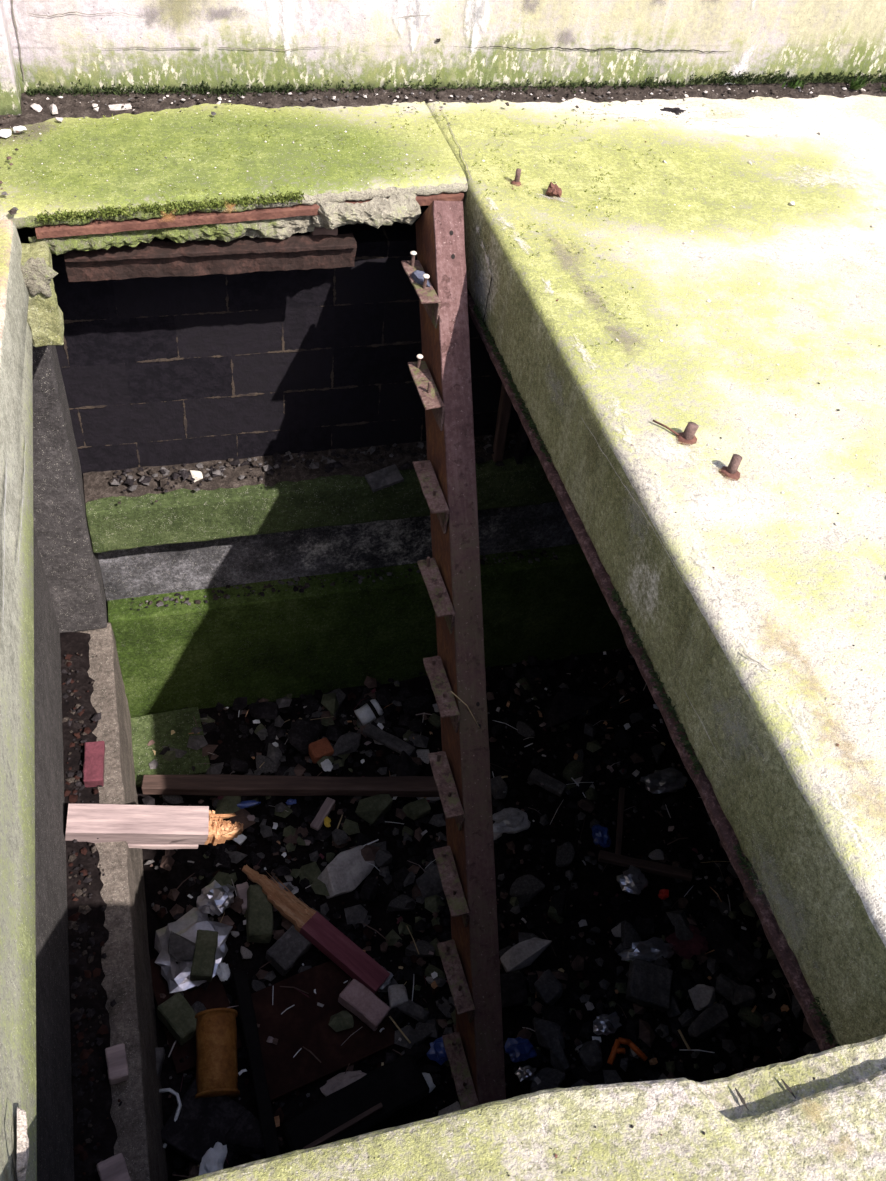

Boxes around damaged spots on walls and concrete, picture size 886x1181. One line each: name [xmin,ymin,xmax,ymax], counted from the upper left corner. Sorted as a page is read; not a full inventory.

leakage [211,8,240,18]
crack [454,46,731,68]
spalling [20,193,421,298]